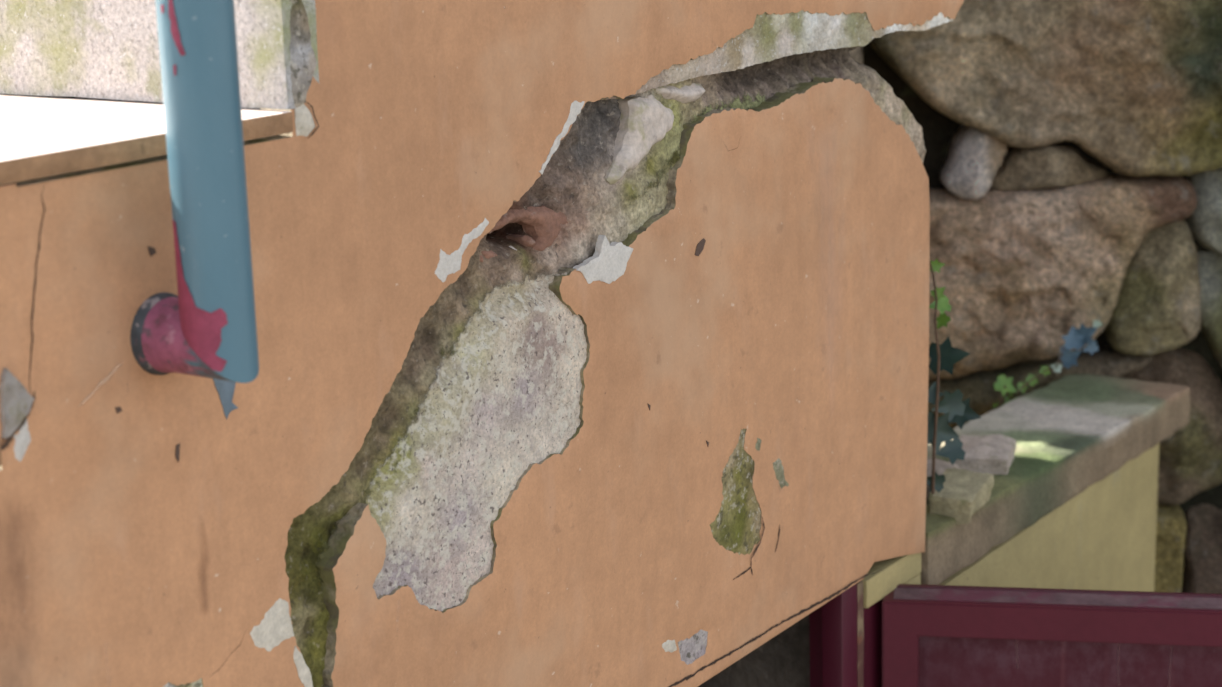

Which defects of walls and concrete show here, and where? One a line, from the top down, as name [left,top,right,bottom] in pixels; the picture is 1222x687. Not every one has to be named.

peeling [289,0,316,137]
spalling [0,368,35,462]
crack [29,185,45,391]
crack [250,10,953,687]
peeling [710,429,780,580]
peeling [773,458,789,489]
flaking render [163,678,202,687]
flaking render [662,629,708,665]